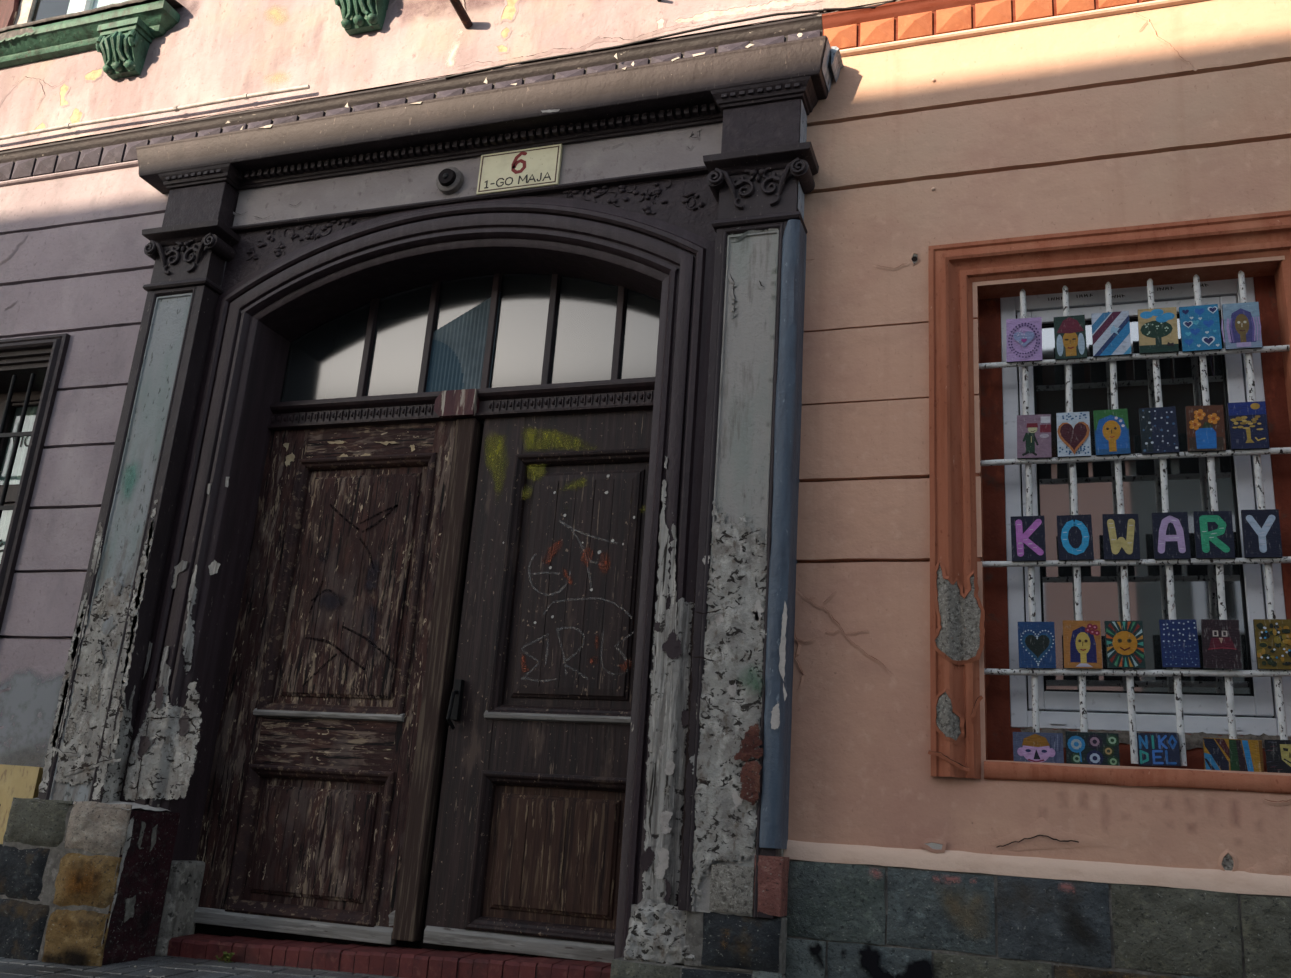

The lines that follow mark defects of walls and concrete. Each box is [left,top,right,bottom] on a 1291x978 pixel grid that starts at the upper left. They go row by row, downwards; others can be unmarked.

flaking render [39,499,221,927]
flaking render [639,456,787,907]
crack [793,589,894,691]
flaking render [931,688,965,746]
flaking render [931,560,985,666]